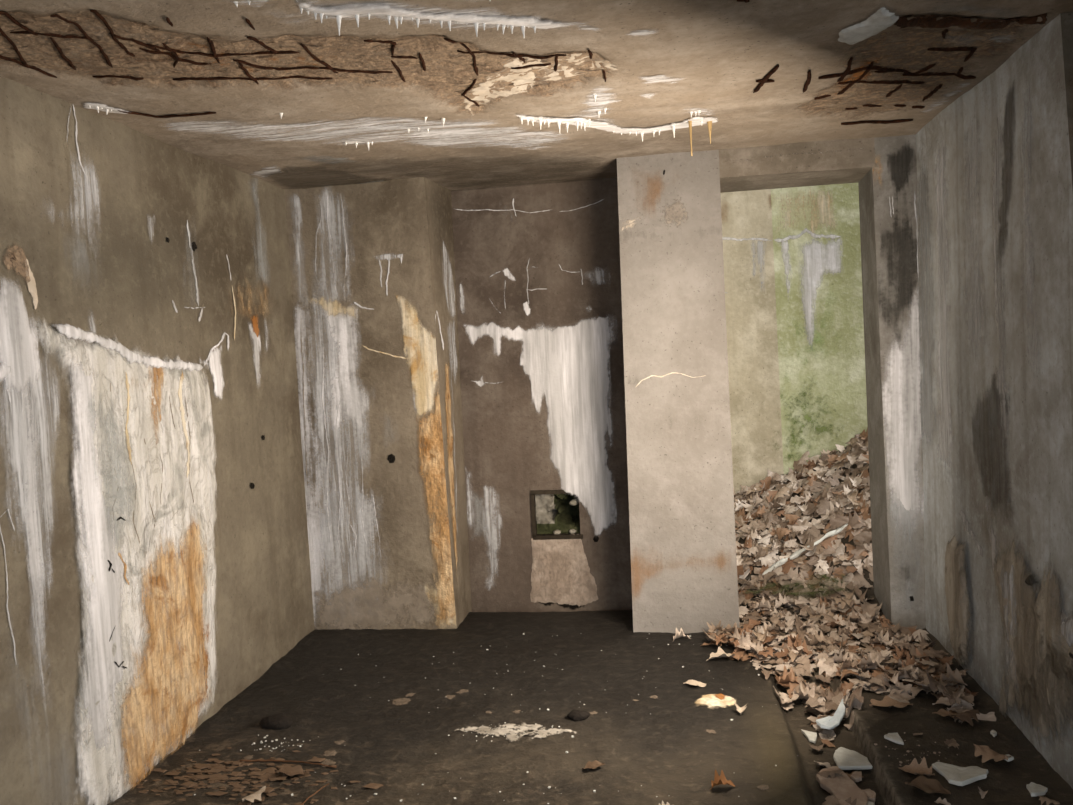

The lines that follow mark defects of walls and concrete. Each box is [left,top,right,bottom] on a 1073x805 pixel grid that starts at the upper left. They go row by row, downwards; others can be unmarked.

spalling [118,110,216,118]
spalling [0,9,616,114]
leakage [299,0,572,38]
leakage [172,93,717,156]
spalling [4,245,38,309]
leakage [878,146,952,537]
leakage [255,159,616,630]
leakage [0,281,229,805]
rust [419,360,458,625]
spalling [535,494,557,524]
peeling [530,534,598,610]
rust [122,525,209,787]